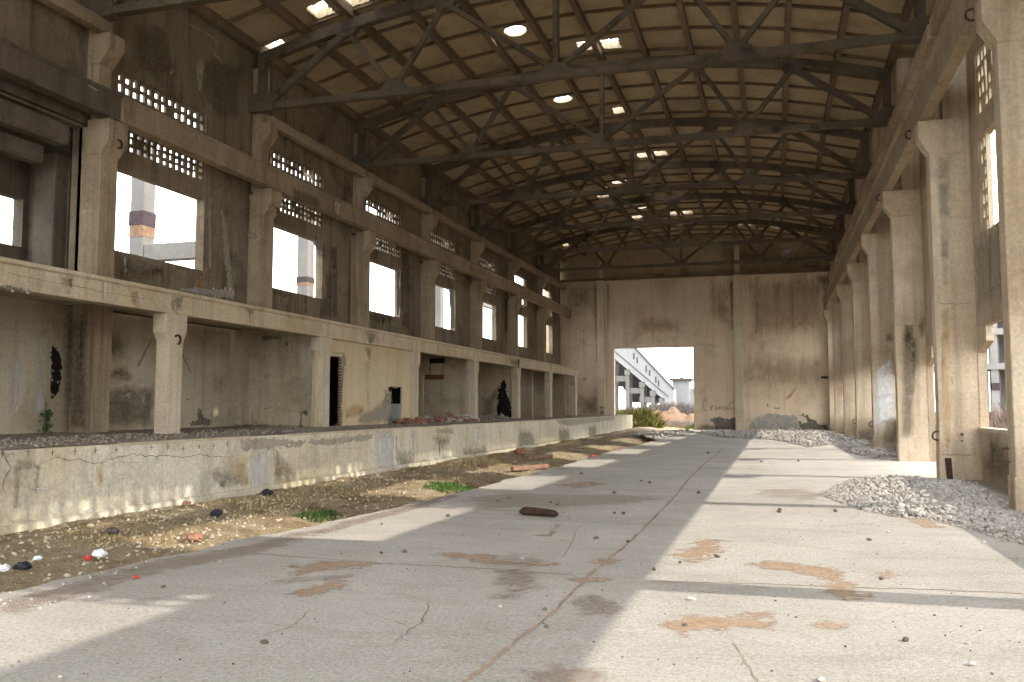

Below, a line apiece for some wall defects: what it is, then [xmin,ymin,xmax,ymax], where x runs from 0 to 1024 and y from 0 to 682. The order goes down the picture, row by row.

hole [50,346,62,399]
crack [3,451,59,491]
crack [40,451,240,466]